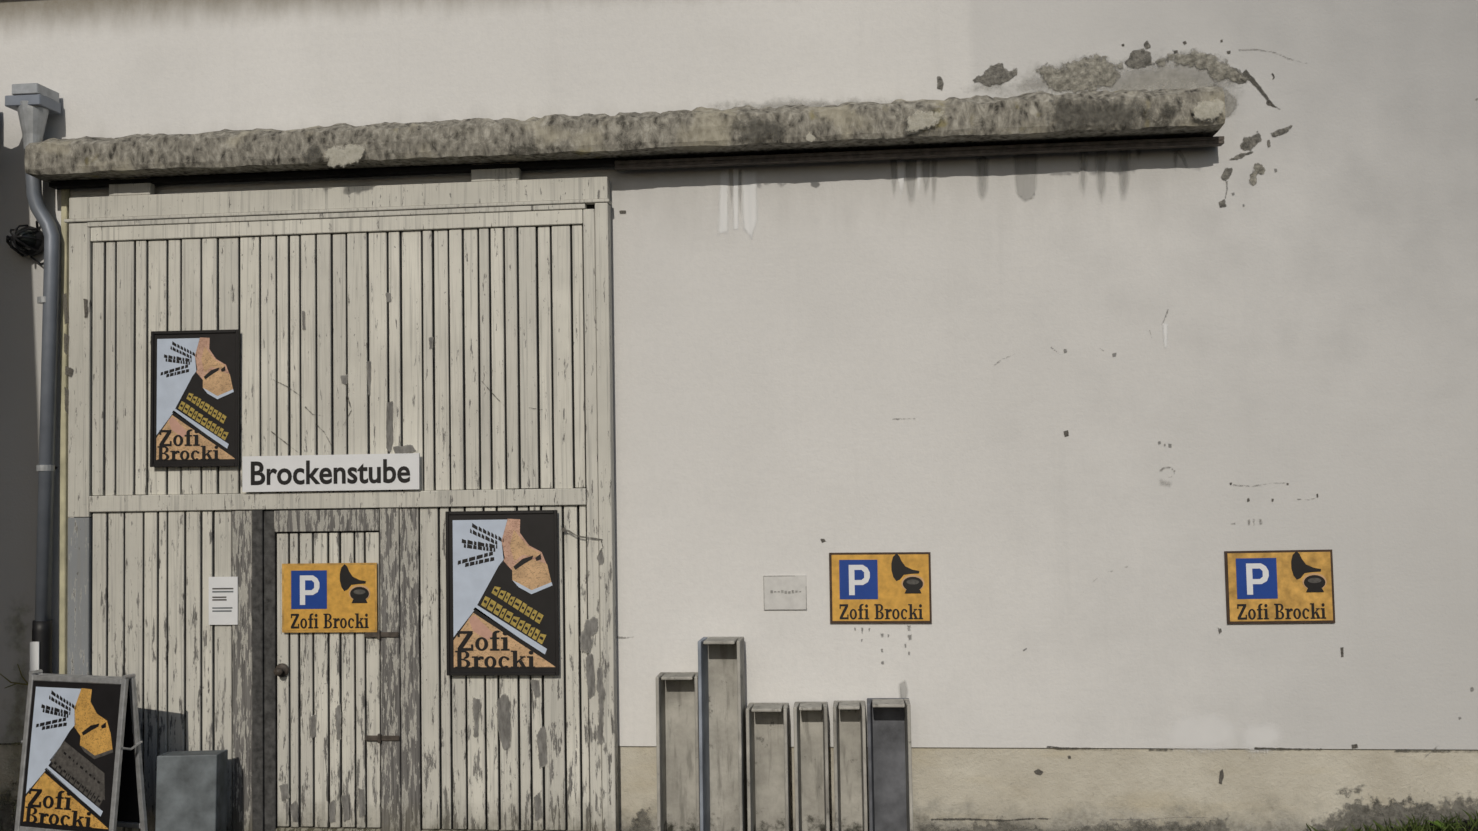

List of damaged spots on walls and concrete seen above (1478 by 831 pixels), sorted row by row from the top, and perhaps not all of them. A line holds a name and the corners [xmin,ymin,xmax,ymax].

flaking render [973,40,1248,129]
leakage [892,159,929,197]
leakage [1015,154,1035,199]
leakage [1081,150,1129,192]
peeling [1219,125,1292,208]
leakage [918,816,1043,831]
leakage [1062,818,1229,831]
leakage [1312,785,1478,831]